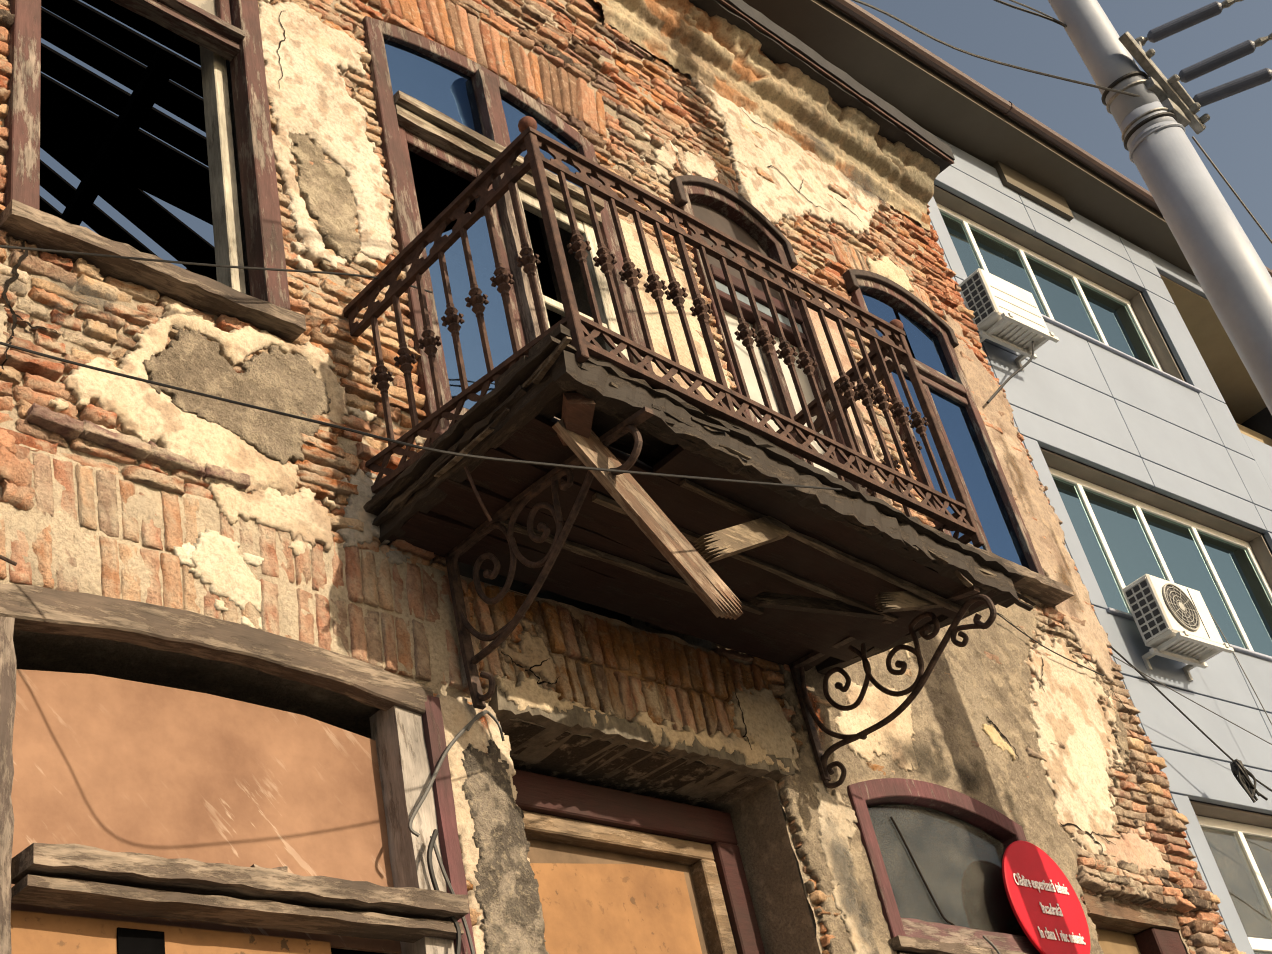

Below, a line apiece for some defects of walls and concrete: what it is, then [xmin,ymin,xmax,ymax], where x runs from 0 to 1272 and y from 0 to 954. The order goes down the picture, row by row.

peeling [639,133,718,181]
peeling [687,73,881,237]
crack [0,240,57,375]
peeling [866,255,914,292]
peeling [49,303,410,630]
crack [501,651,559,685]
peeling [494,617,611,727]
peeling [631,686,801,772]
peeling [1024,631,1190,878]
spalling [1182,889,1246,954]